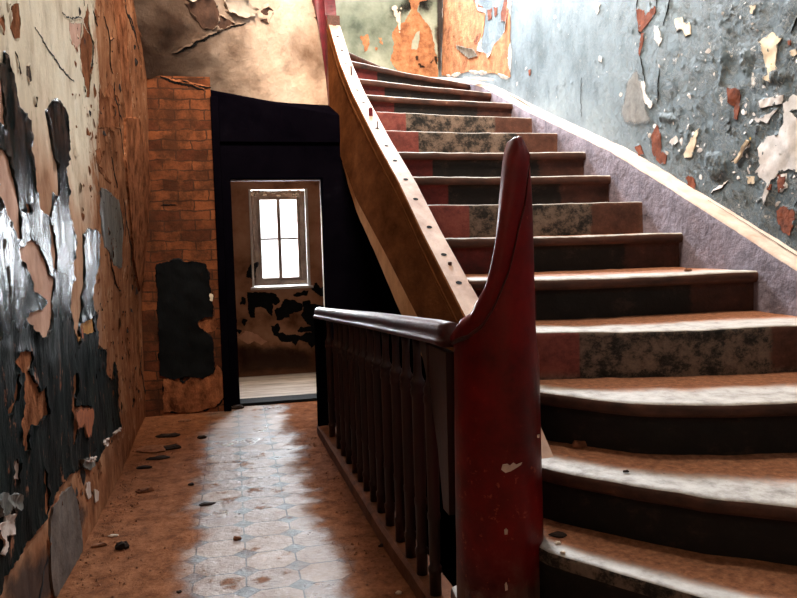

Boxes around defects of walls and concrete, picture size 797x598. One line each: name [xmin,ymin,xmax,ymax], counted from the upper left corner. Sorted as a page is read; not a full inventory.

crack [125,0,139,49]
crack [172,22,246,54]
flaking render [184,0,274,33]
flaking render [360,0,525,86]
crack [35,3,132,291]
flaking render [626,0,797,237]
peeling [0,0,143,598]
peeling [237,282,324,348]
spalling [501,462,522,473]